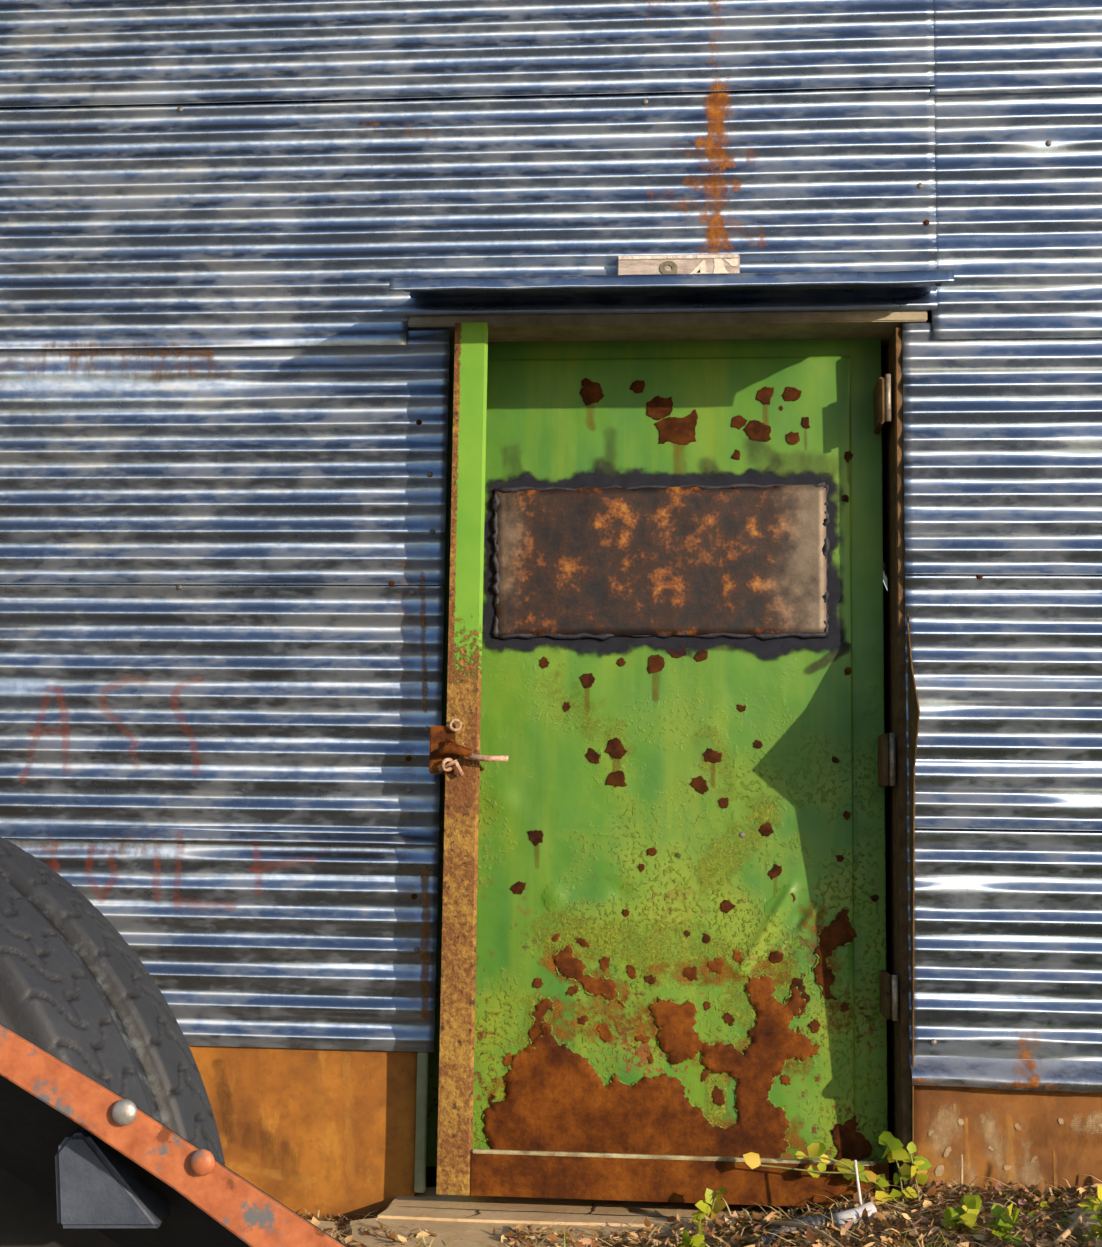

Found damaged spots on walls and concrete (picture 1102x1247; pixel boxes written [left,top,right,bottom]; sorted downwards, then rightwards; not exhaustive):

corrosion [689,85,741,253]
corrosion [579,378,604,406]
corrosion [630,380,698,455]
corrosion [647,647,708,674]
corrosion [579,673,595,708]
corrosion [585,737,628,787]
corrosion [690,748,729,808]
corrosion [527,830,544,846]
corrosion [510,881,526,894]
corrosion [768,864,782,879]
corrosion [482,893,857,1159]
corrosion [831,1116,873,1161]